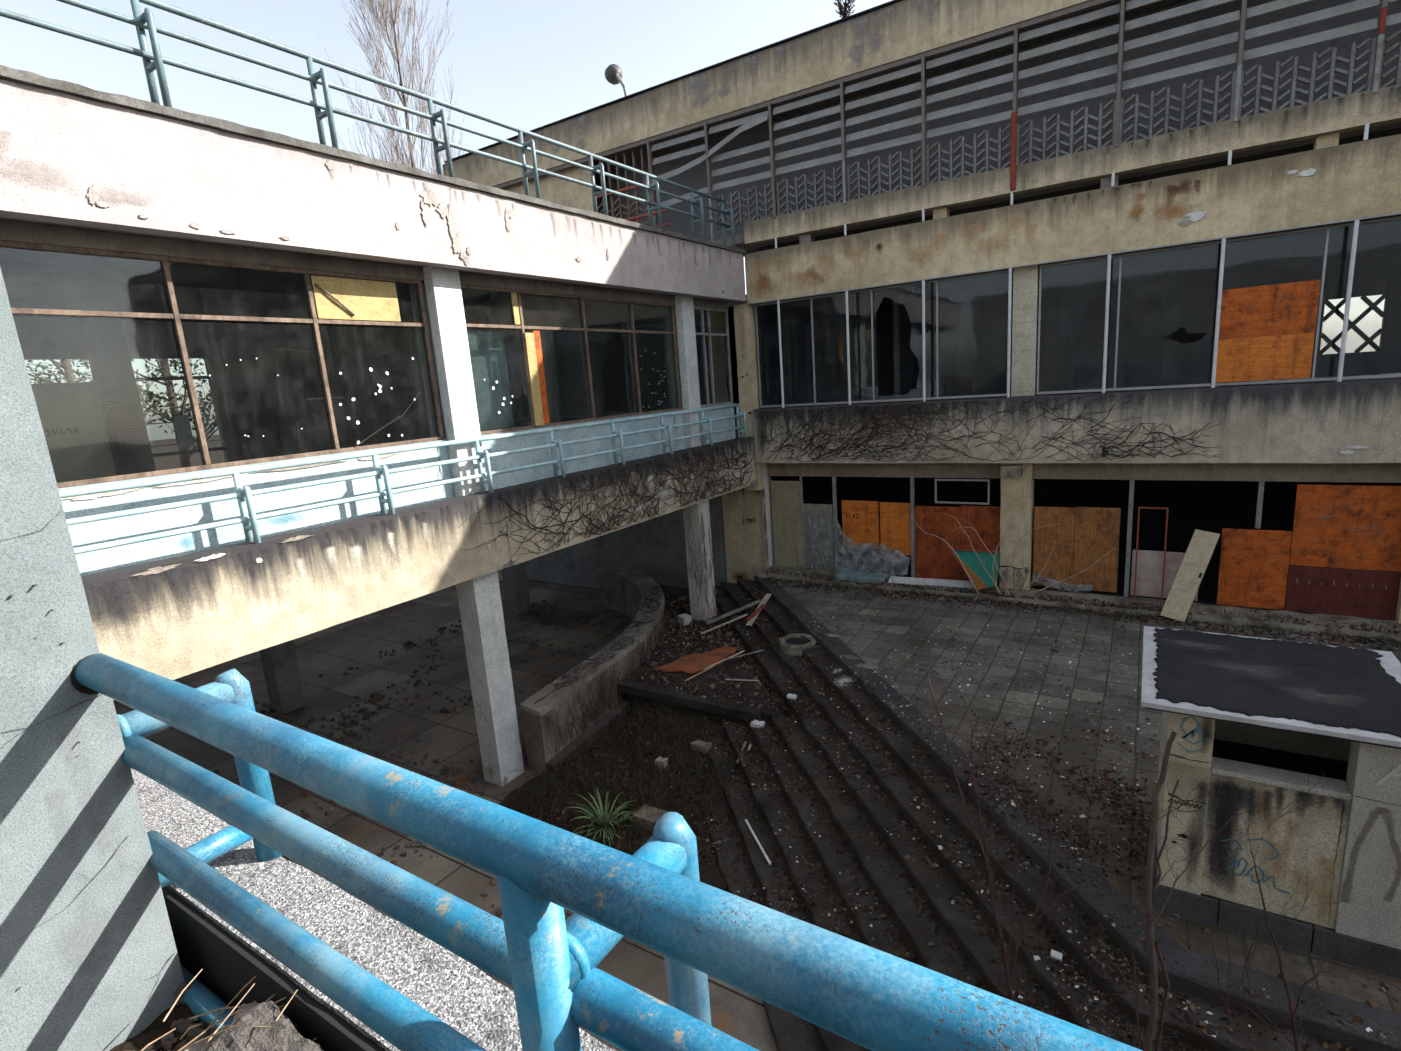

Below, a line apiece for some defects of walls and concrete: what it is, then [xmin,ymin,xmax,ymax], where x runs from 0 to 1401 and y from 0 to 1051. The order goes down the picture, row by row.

spalling [1178,211,1207,226]
leakage [320,485,545,563]
leakage [84,539,303,616]
leakage [1188,783,1345,883]